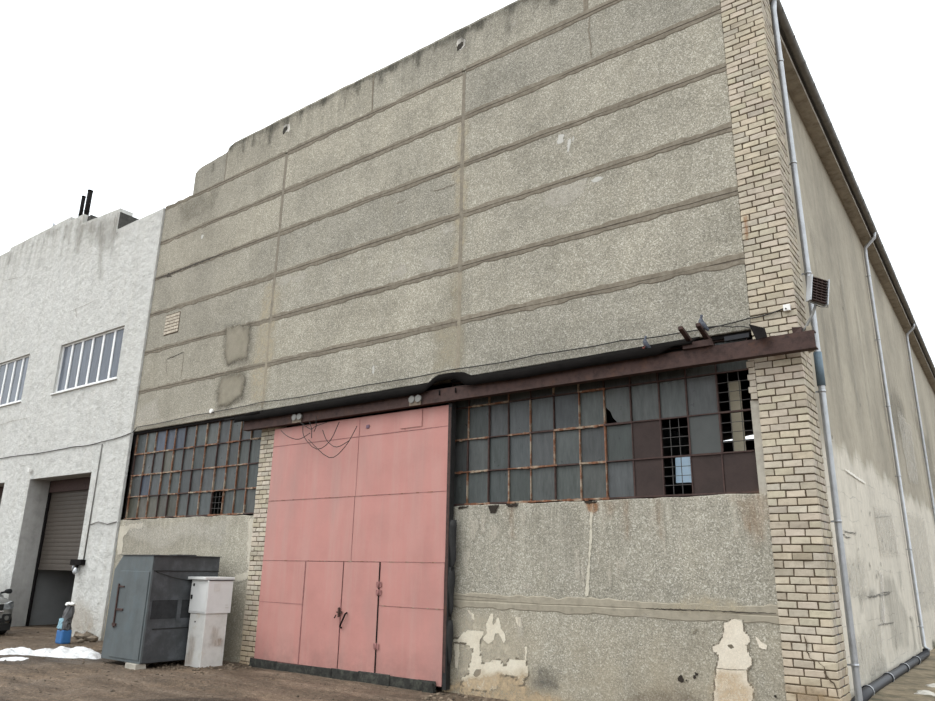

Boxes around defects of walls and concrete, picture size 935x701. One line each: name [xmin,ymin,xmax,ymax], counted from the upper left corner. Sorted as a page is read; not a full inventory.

water stain [577,504,594,596]
peeling [453,610,529,692]
peeling [712,618,767,701]